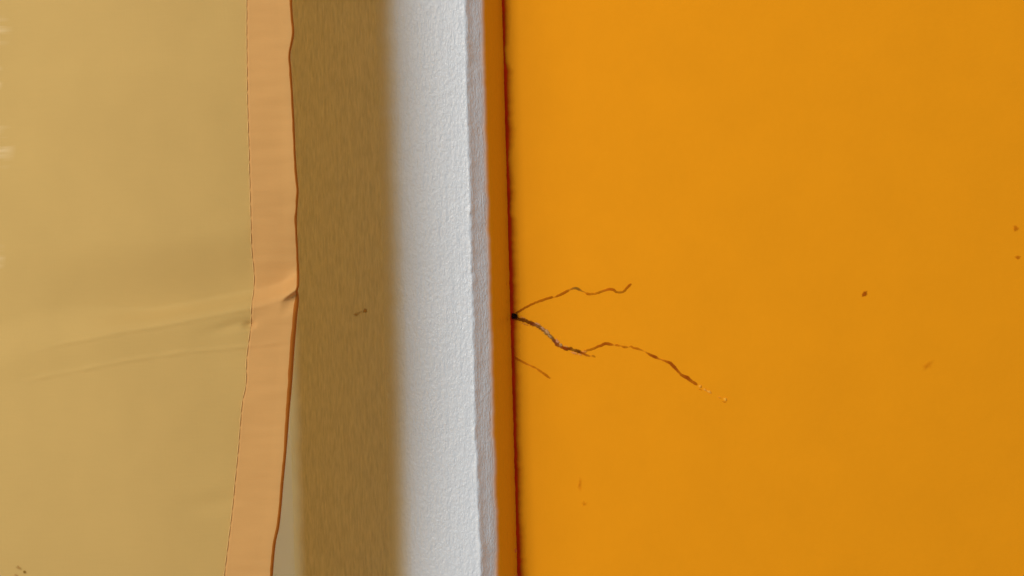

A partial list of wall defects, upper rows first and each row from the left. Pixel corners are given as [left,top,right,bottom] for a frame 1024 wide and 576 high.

crack [502,0,727,576]